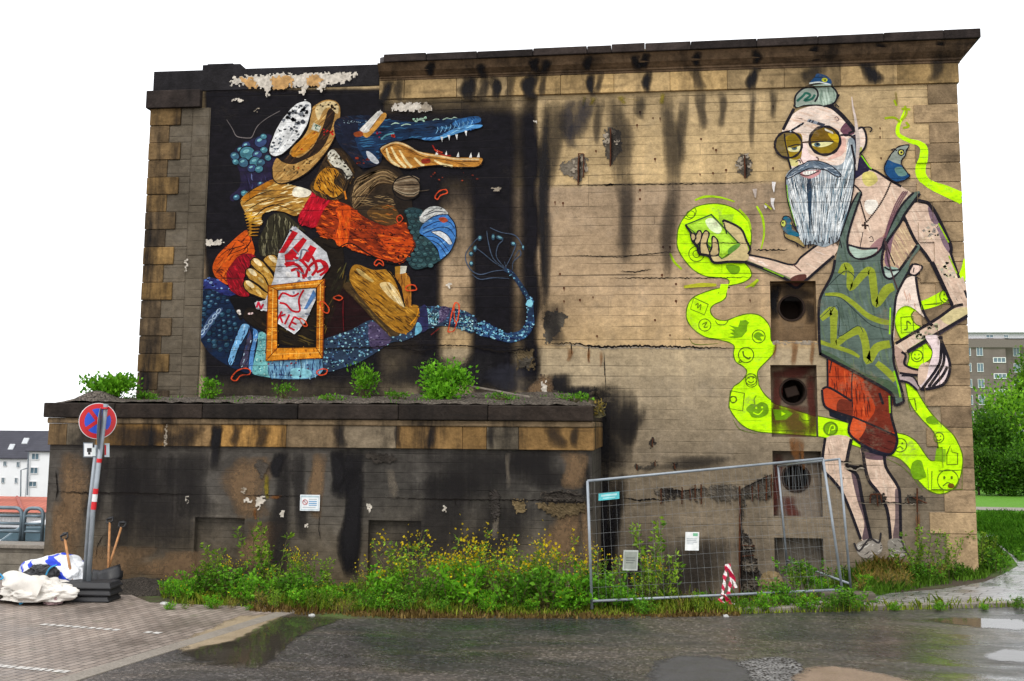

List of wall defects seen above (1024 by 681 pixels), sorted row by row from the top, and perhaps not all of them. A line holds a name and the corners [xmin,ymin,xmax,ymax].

peeling [229,72,358,102]
leakage [746,50,762,139]
leakage [861,63,883,84]
crack [298,342,731,388]
leakage [226,427,363,574]
leakage [392,354,646,595]
leakage [664,456,723,468]
spalling [625,474,773,601]
leakage [655,542,723,595]